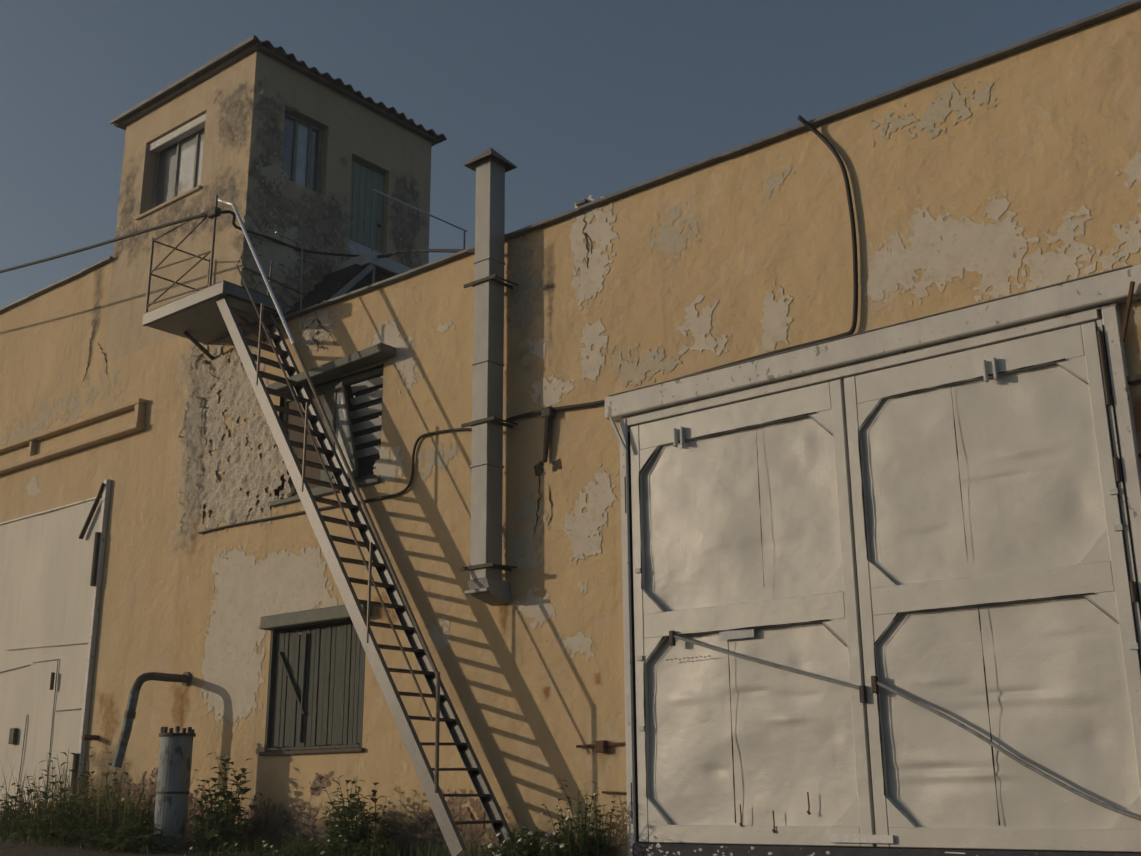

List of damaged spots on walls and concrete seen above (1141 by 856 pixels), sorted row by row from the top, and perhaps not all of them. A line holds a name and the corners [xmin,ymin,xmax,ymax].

peeling [867,74,996,147]
leakage [115,82,351,302]
crack [582,212,592,268]
peeling [858,152,1141,306]
crack [83,322,107,381]
peeling [368,315,423,396]
peeling [760,283,793,351]
flaking render [534,458,561,476]
peeling [181,339,338,732]
crack [534,475,552,533]
peeling [561,463,618,564]
peeling [517,585,556,629]